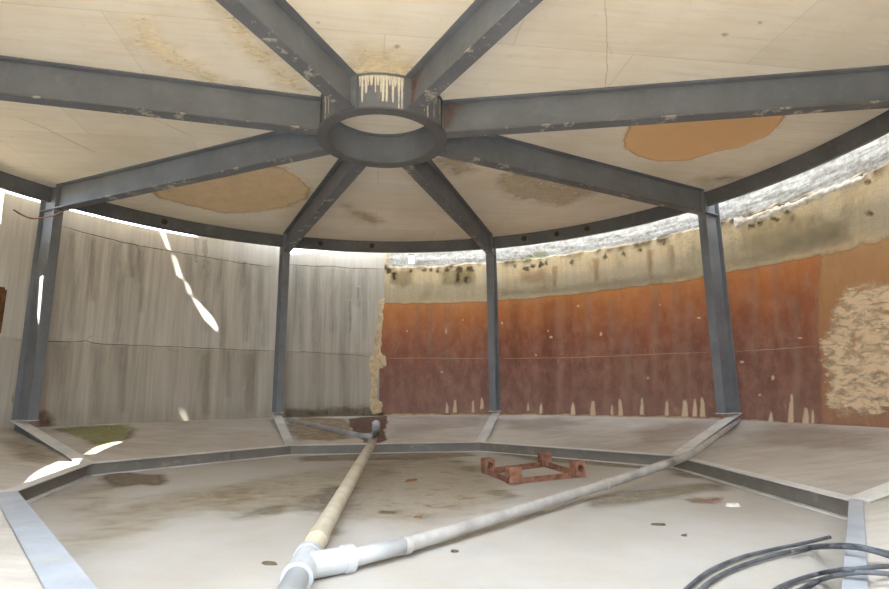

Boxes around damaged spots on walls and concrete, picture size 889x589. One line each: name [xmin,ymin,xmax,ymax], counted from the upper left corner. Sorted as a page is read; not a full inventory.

crack [604,0,612,87]
water stain [359,67,404,109]
peeling [624,115,784,161]
peeling [156,167,308,212]
water stain [410,266,473,283]
crack [48,336,267,351]
spalling [368,298,386,415]
rust [349,238,889,443]
peeling [819,283,889,414]
water stain [104,473,164,486]